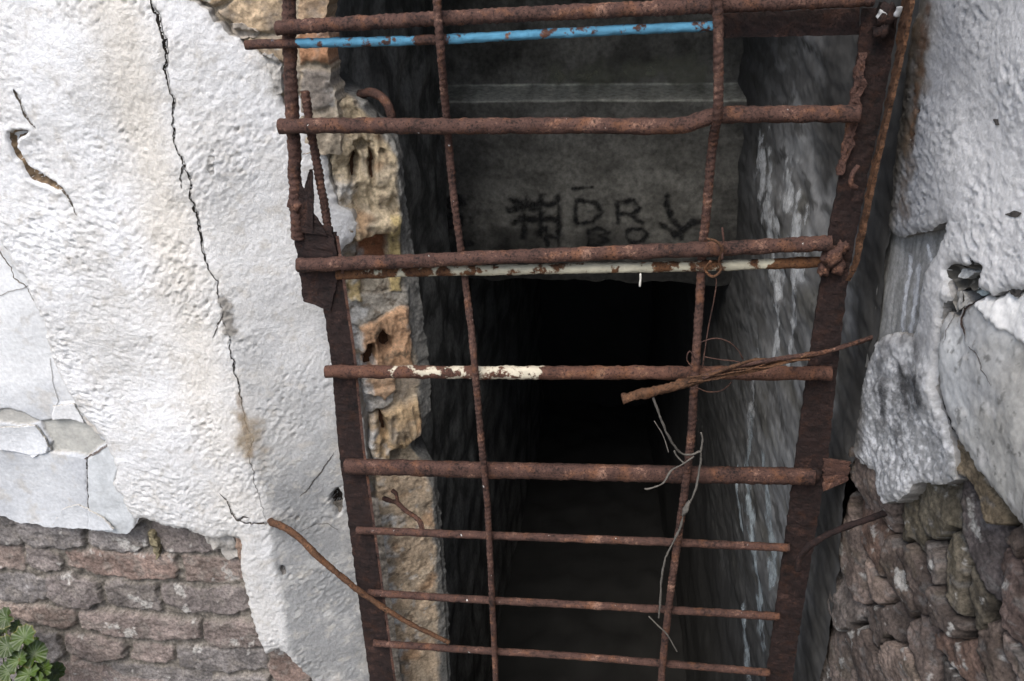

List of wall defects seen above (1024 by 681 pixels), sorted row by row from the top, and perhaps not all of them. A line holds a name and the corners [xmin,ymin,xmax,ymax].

flaking render [201,0,346,118]
flaking render [303,133,355,175]
crack [150,0,267,524]
flaking render [947,260,991,312]
spalling [363,330,388,363]
flaking render [0,241,312,681]
flaking render [332,487,343,512]
flaking render [372,497,402,681]